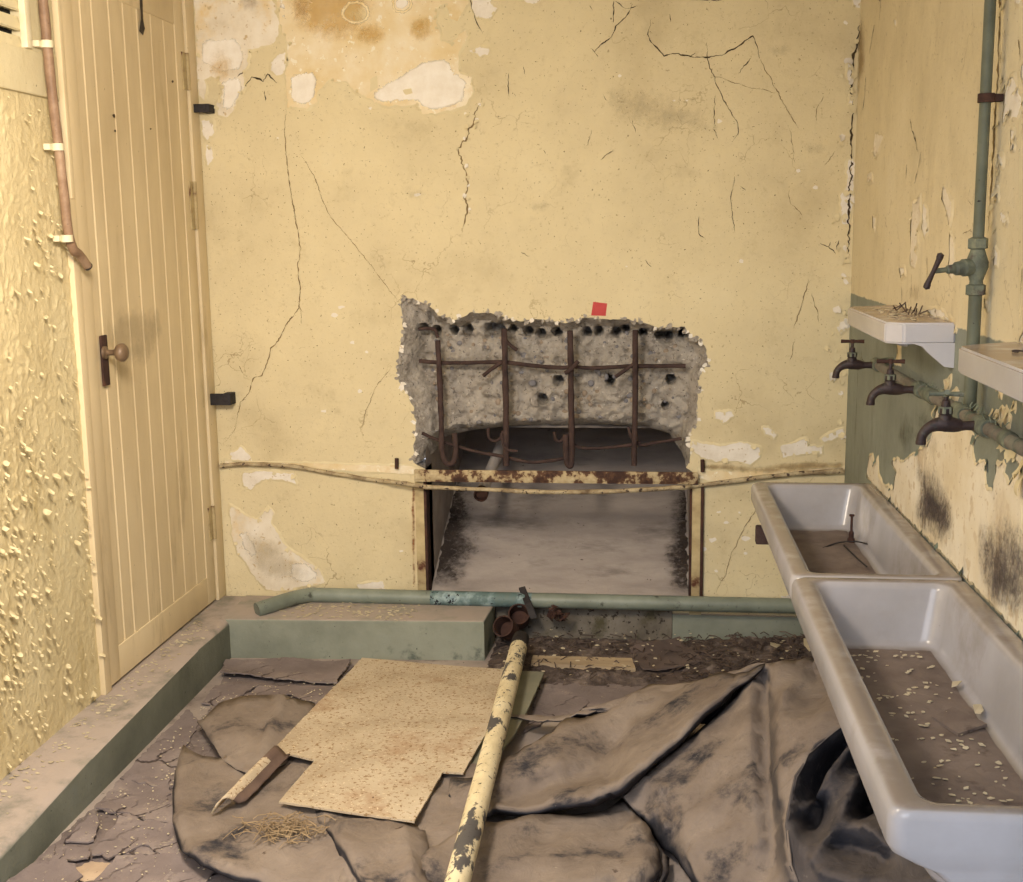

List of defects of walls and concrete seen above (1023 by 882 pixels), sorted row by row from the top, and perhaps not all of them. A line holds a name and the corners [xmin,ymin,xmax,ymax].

crack [238,72,277,100]
peeling [193,0,499,167]
crack [590,2,823,159]
crack [226,116,396,441]
spalling [223,295,850,491]
peeling [943,373,960,401]
peeling [988,390,1017,429]
peeling [227,502,326,592]
mould [917,476,951,533]
peeling [866,430,1023,640]
mould [984,532,1023,604]